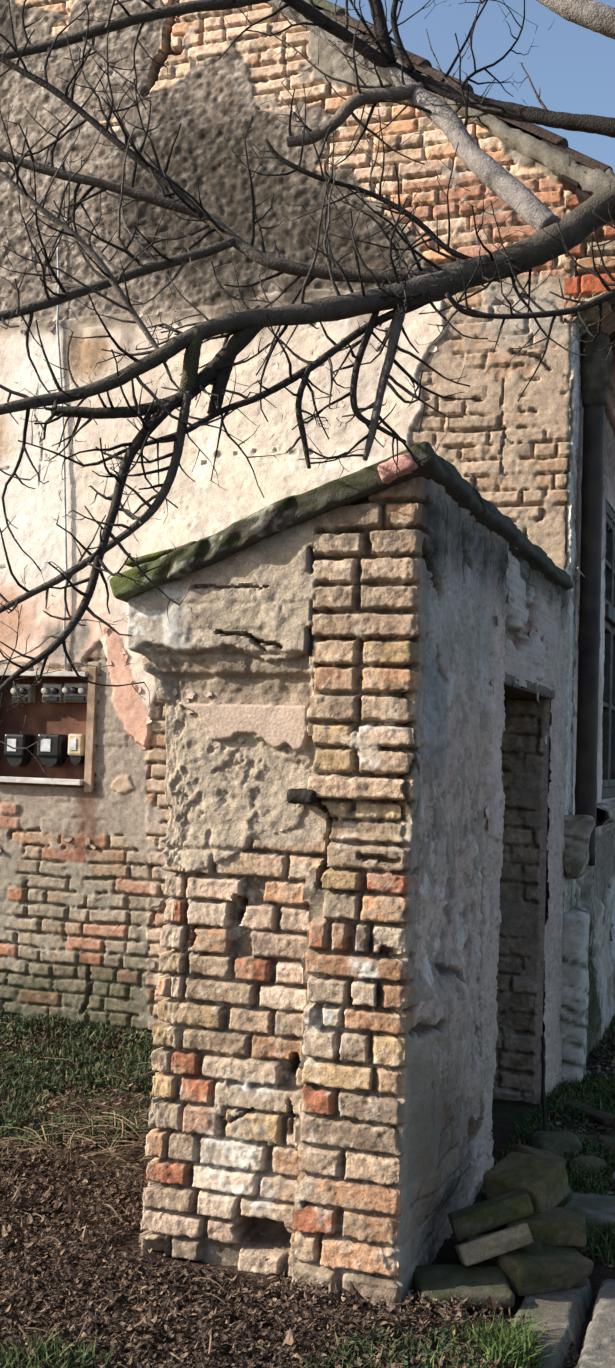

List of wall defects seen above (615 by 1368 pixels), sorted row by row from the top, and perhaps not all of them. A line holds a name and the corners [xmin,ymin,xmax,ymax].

spalling [18,0,77,15]
spalling [151,0,537,265]
spalling [458,115,574,218]
crack [189,583,269,591]
spalling [416,254,575,841]
spalling [103,626,313,751]
crack [213,629,283,654]
peeling [111,775,133,794]
spalling [0,834,161,1035]